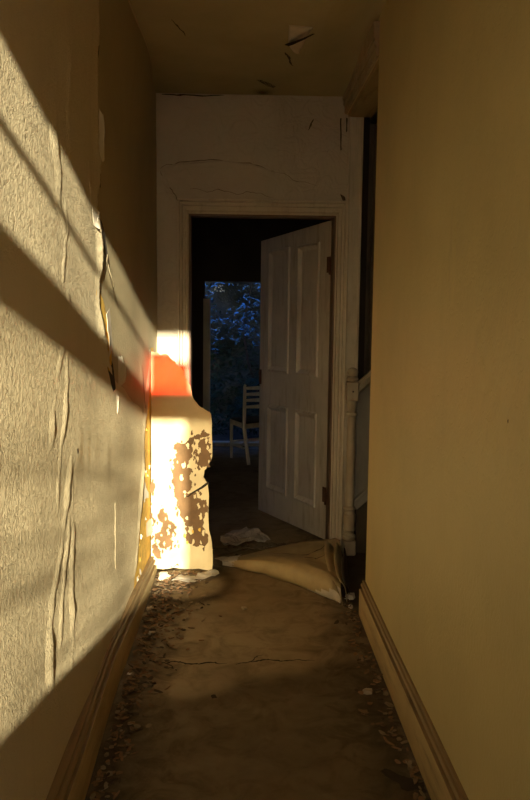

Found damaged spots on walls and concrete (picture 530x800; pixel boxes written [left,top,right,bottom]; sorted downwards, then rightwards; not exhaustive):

flaking render [96,290,112,371]
peeling [134,370,212,588]
crack [140,655,314,671]